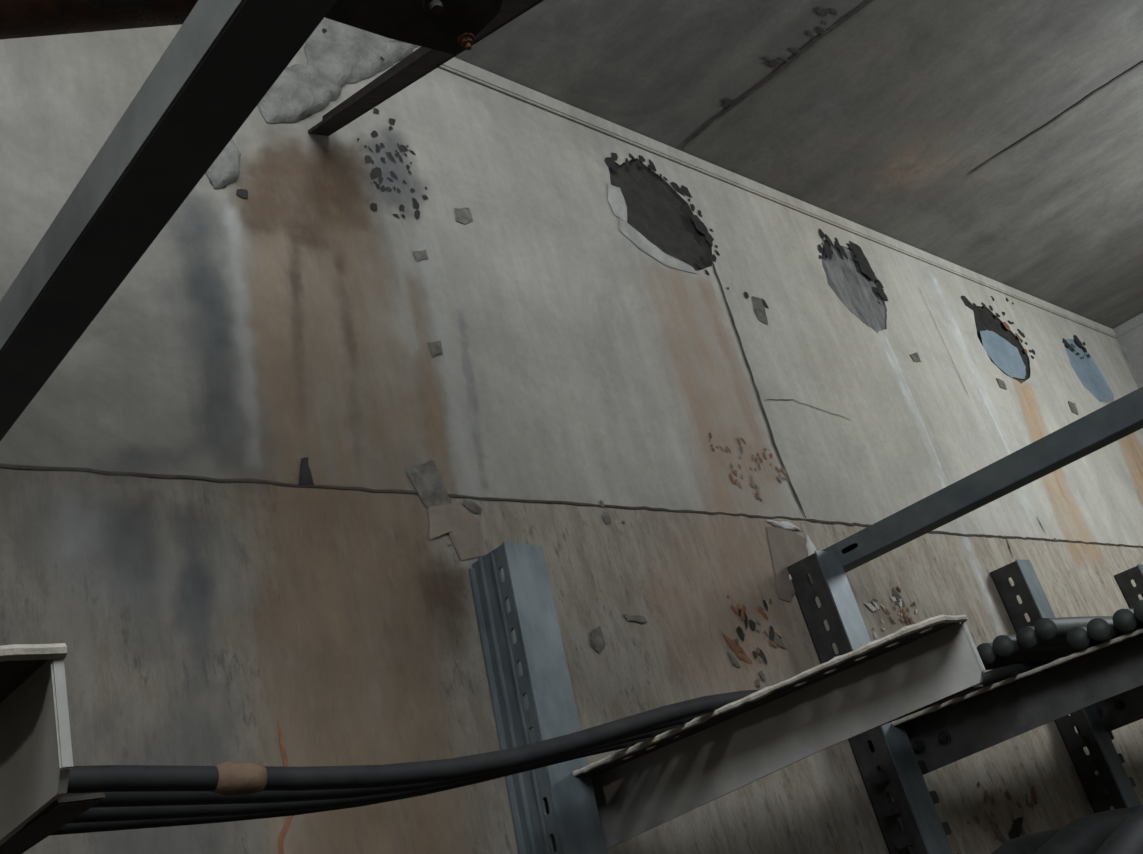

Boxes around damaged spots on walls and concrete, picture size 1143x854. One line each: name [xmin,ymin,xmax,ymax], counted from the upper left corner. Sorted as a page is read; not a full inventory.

spalling [357,108,428,219]
spalling [605,153,720,275]
crack [681,0,873,149]
crack [967,62,1143,176]
spalling [818,229,888,333]
crack [0,256,871,527]
spalling [961,296,1035,389]
spalling [1062,335,1114,403]
crack [928,519,1143,557]